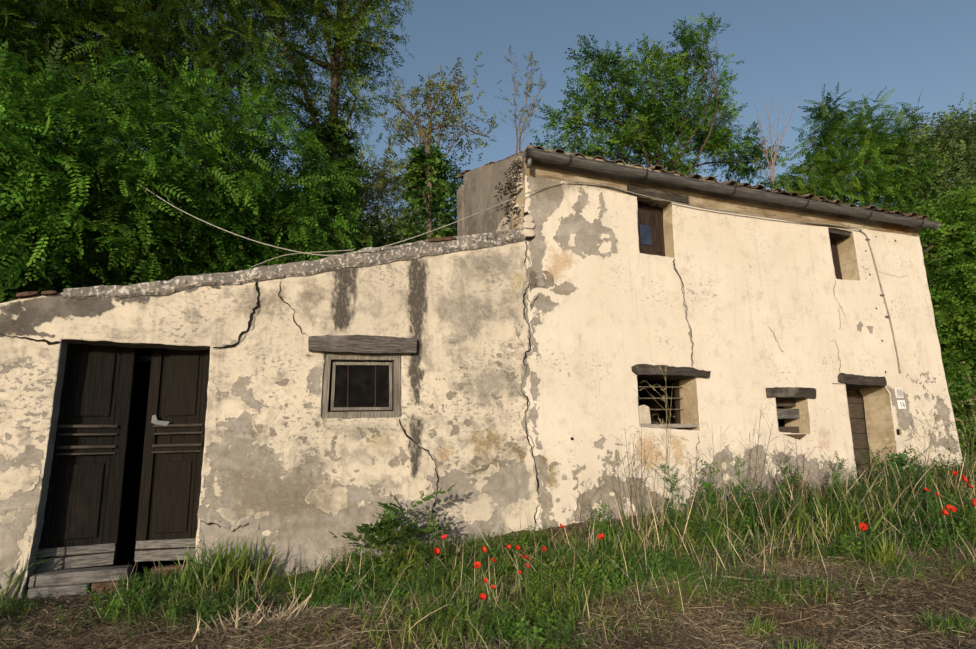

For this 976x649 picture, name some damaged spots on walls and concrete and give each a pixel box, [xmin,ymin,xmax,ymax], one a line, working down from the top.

peeling [0,402,47,600]
peeling [0,349,58,392]
crack [213,282,308,349]
water stain [331,267,358,330]
water stain [408,415,423,477]
water stain [408,259,427,405]
crack [399,419,458,541]
peeling [198,156,856,577]
crack [515,240,544,530]
crack [672,258,694,367]
peeling [887,371,961,459]